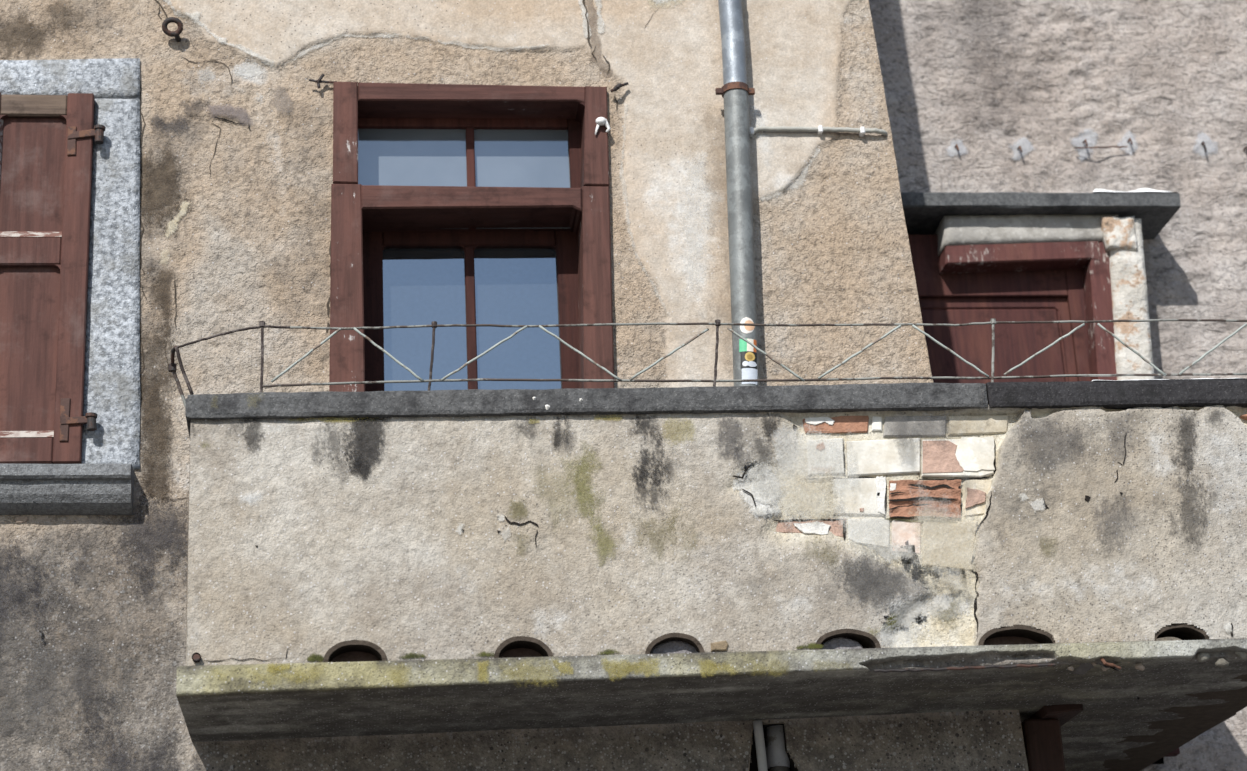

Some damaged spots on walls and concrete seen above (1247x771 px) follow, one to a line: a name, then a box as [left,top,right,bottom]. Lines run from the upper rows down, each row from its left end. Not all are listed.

crack [579,0,618,111]
leakage [140,150,192,233]
leakage [148,268,175,346]
leakage [113,457,188,585]
leakage [344,417,388,479]
crack [504,515,538,544]
leakage [634,414,664,510]
flaking render [732,415,1008,585]
crack [971,492,992,644]
leakage [1173,417,1197,471]
flaking render [881,597,922,642]